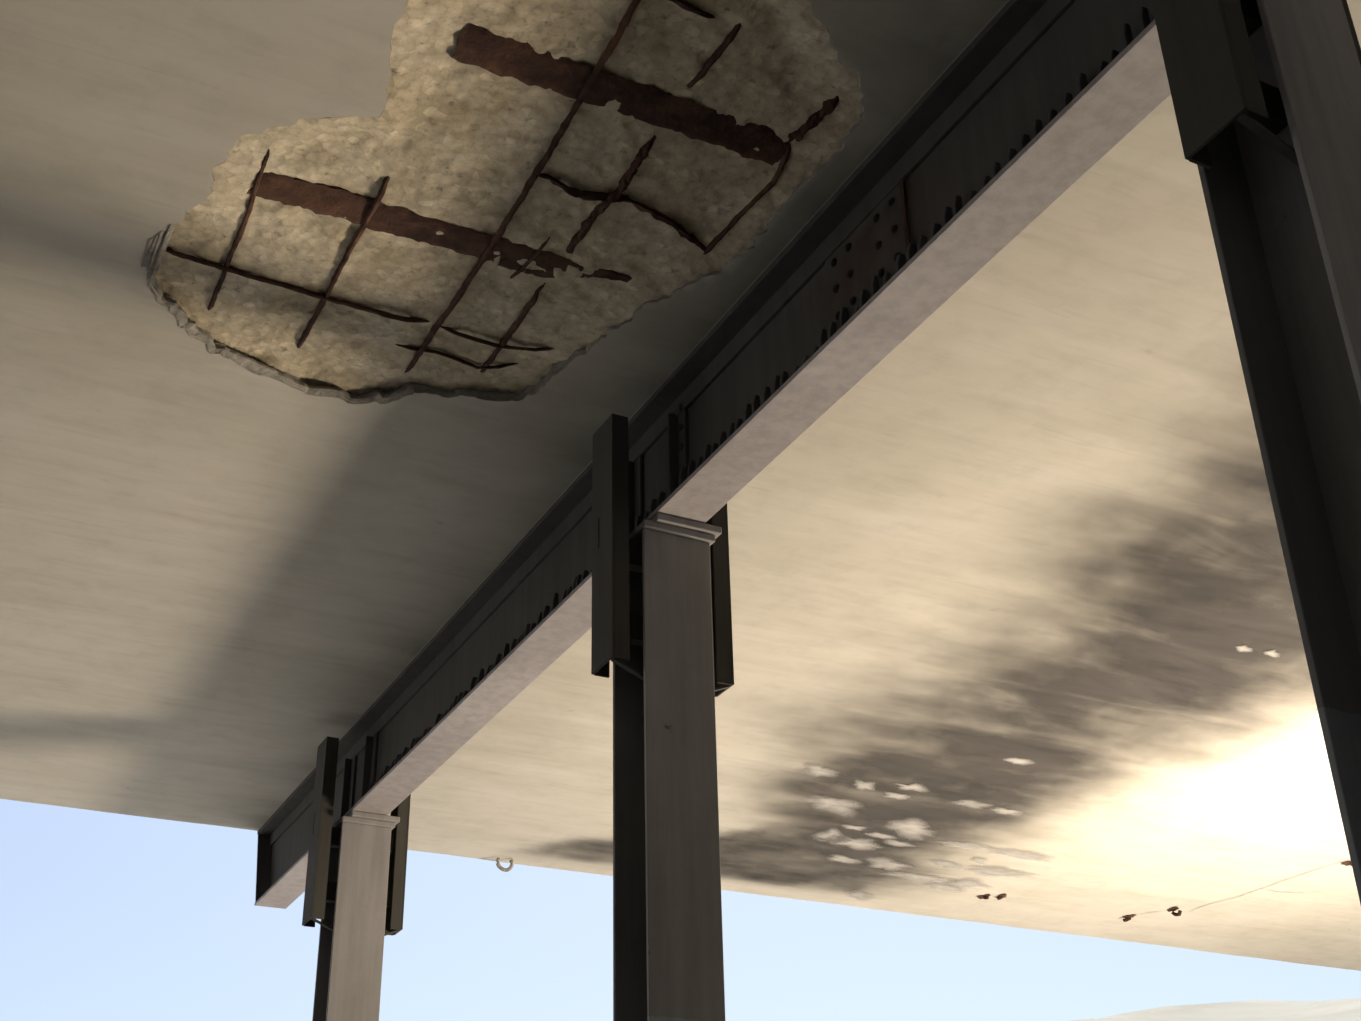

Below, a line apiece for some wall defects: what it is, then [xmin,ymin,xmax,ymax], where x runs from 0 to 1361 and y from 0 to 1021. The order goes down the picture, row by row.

spalling [141,0,864,405]